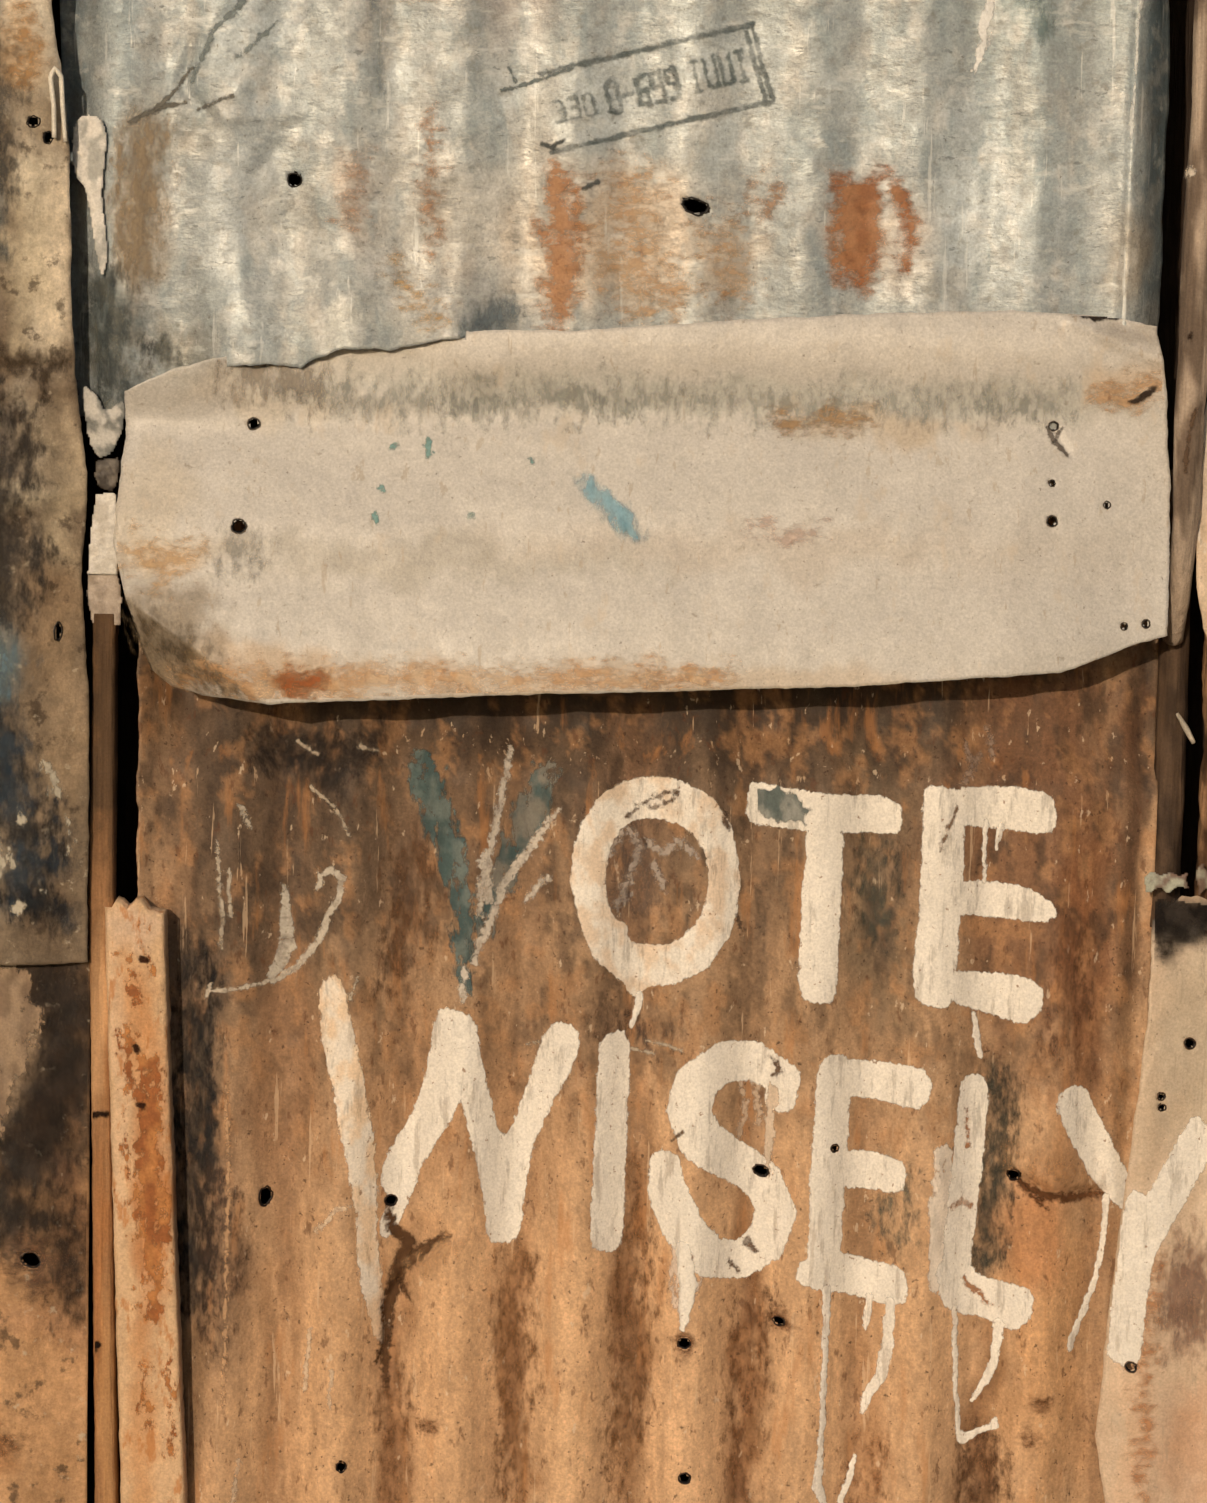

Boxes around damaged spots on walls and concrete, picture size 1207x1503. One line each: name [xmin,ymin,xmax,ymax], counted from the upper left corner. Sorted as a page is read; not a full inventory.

leakage [82,119,182,409]
rust [533,162,688,331]
rust [827,166,921,292]
leakage [0,349,72,622]
leakage [0,644,72,932]
rust [166,656,725,701]